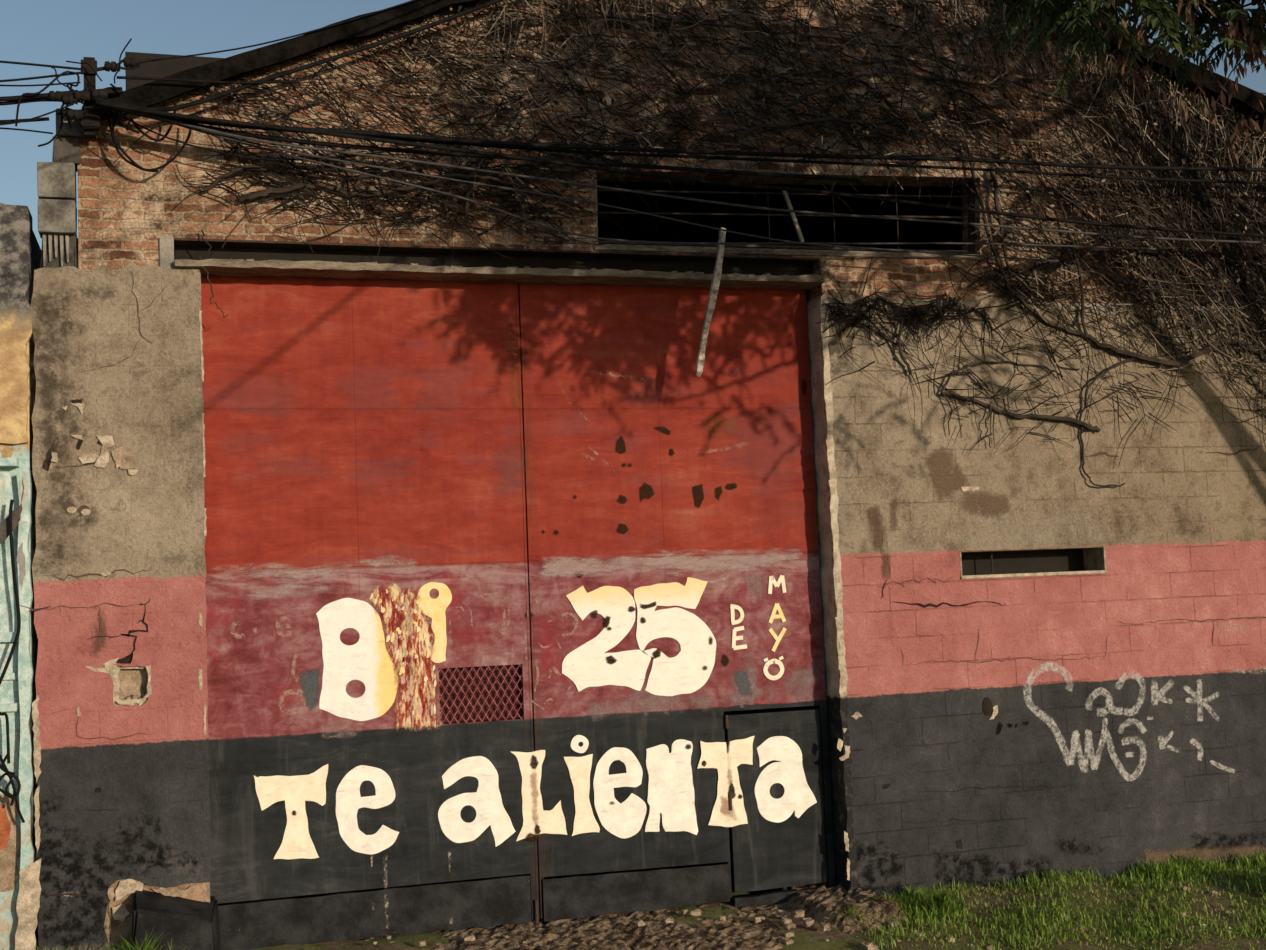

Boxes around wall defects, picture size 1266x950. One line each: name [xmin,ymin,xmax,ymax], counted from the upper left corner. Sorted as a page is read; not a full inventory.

spalling [62,398,85,414]
spalling [42,432,144,476]
spalling [64,503,91,515]
crack [20,569,151,657]
peeling [369,584,438,729]
spalling [85,658,152,706]
damp [1193,832,1263,853]
flaking render [108,878,205,950]